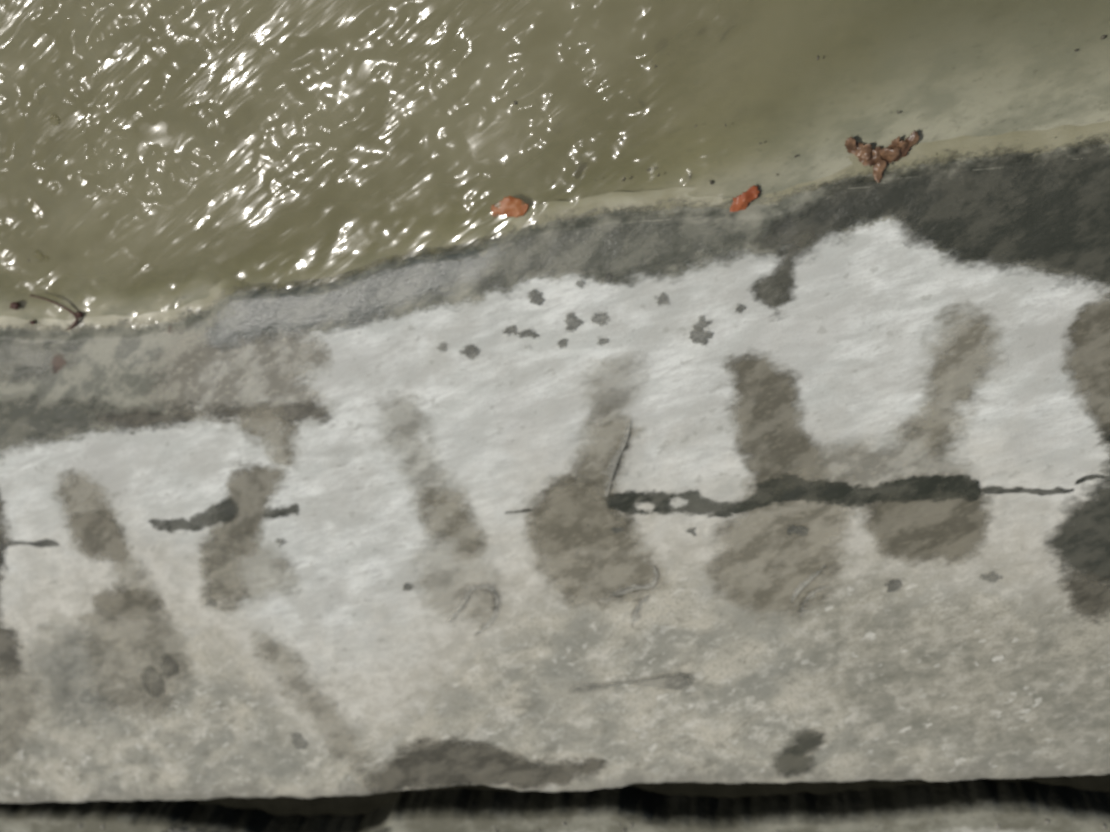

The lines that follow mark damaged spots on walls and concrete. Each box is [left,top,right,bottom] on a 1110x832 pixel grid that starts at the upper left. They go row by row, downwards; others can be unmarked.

leakage [0,139,1110,621]
crack [149,498,298,533]
crack [606,474,1106,518]
leakage [0,622,35,759]
leakage [90,572,187,710]